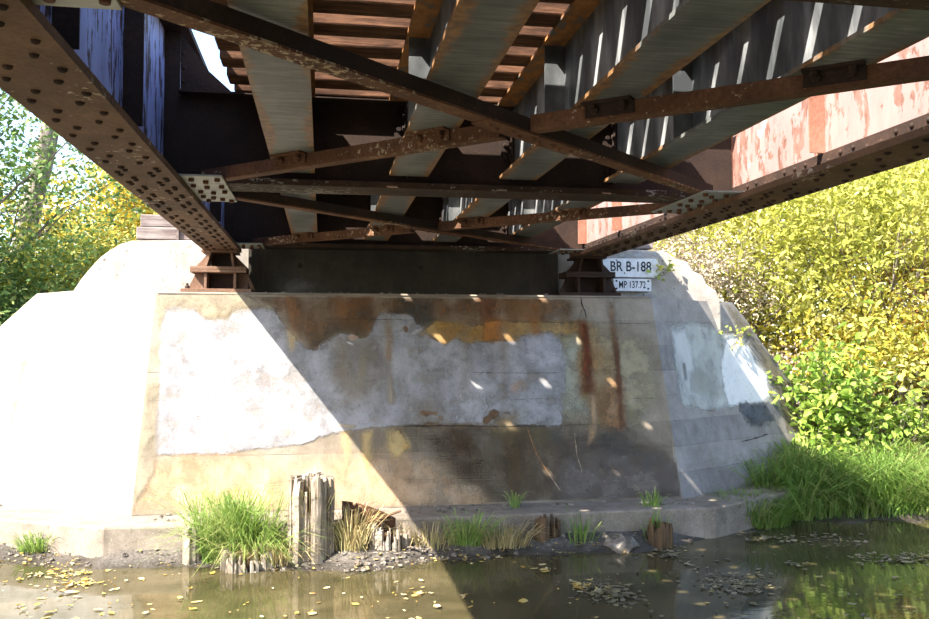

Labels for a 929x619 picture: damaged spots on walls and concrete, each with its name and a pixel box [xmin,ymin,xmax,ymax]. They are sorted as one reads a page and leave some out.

peeling [156,307,566,454]
rust [579,310,626,441]
peeling [672,323,770,410]
leakage [739,346,799,428]